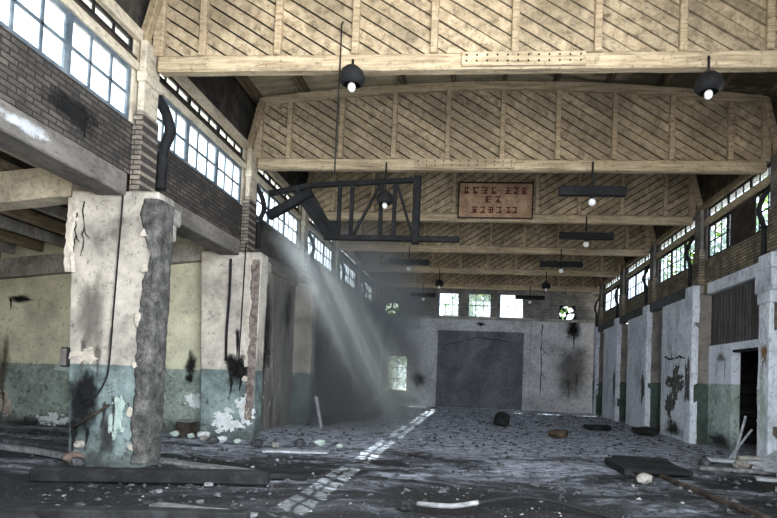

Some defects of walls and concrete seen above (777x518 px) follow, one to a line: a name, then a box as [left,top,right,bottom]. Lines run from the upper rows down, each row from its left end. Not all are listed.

damp [48,88,97,138]
spalling [108,198,175,464]
spalling [211,258,261,434]
damp [561,315,584,395]
peeling [663,356,690,424]
damp [12,417,89,451]
damp [100,397,115,452]